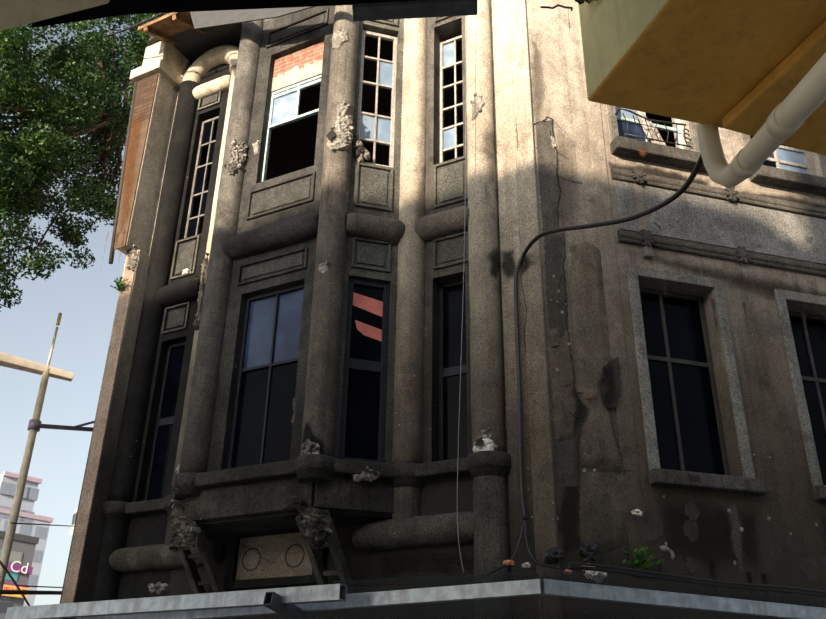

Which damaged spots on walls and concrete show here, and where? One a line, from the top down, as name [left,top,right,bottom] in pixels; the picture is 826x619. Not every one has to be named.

spalling [224,138,260,176]
spalling [326,99,371,163]
spalling [470,93,485,121]
spalling [193,253,209,331]
crack [516,116,634,487]
spalling [473,425,498,452]
spalling [353,466,380,482]
spalling [169,500,201,553]